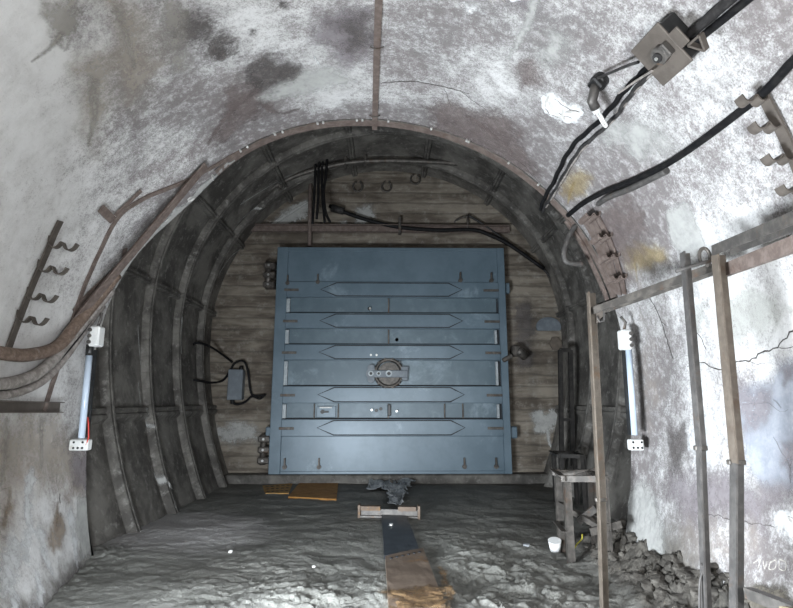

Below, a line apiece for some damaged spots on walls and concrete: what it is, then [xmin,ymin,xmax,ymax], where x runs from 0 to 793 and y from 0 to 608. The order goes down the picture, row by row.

water stain [34,0,78,60]
water stain [162,2,238,69]
water stain [314,10,371,66]
water stain [208,54,348,144]
crack [650,299,793,370]